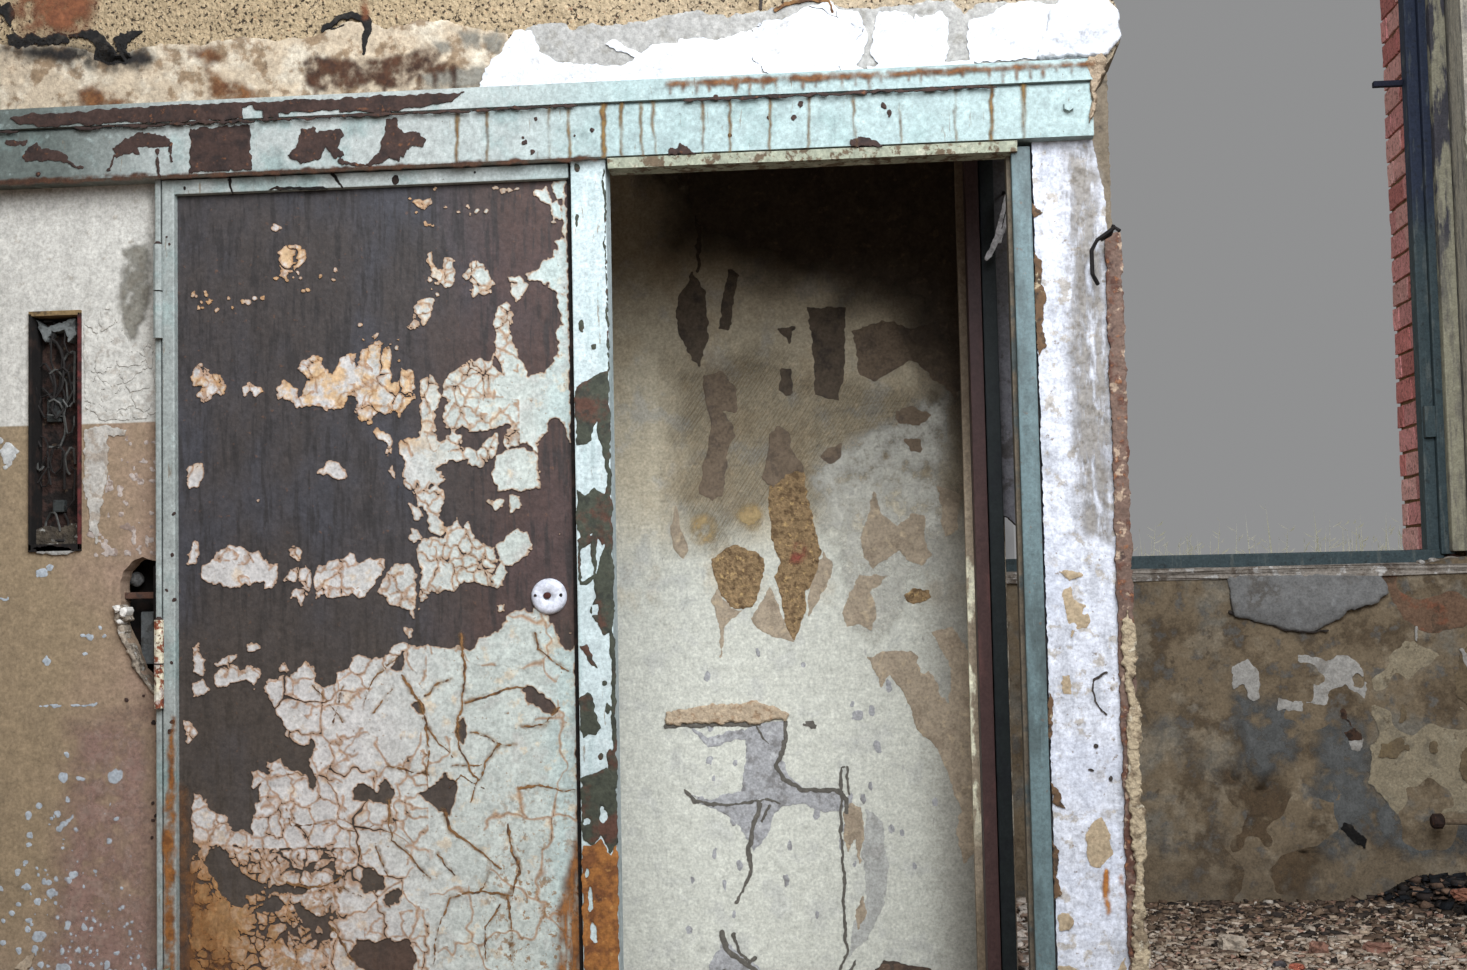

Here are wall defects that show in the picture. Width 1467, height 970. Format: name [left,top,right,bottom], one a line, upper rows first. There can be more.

peeling [80,305,156,694]
peeling [186,163,618,970]
peeling [676,247,739,501]
spalling [704,426,833,682]
peeling [778,306,955,400]
spalling [1033,252,1047,355]
peeling [0,752,156,970]
rust [151,717,176,970]
crack [286,632,575,964]
rust [557,839,620,970]
peeling [867,627,974,863]
peeling [1277,575,1467,814]